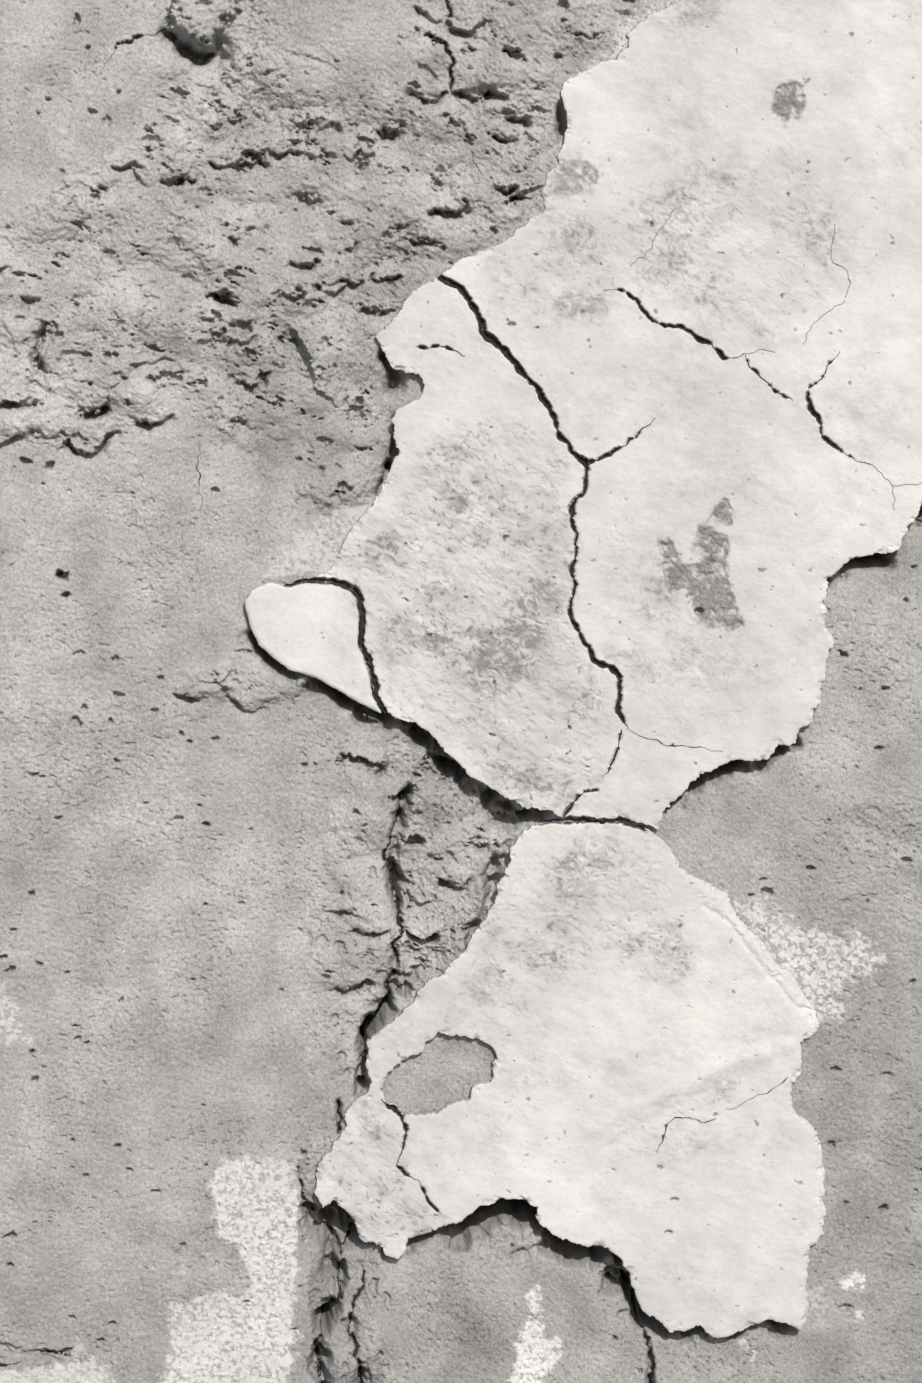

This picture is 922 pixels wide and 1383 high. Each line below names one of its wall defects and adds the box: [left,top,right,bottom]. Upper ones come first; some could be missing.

crack [103,0,172,69]
crack [423,0,483,175]
crack [284,577,386,713]
flaking render [0,0,922,830]
crack [417,276,722,831]
crack [604,210,922,510]
crack [297,1164,318,1214]
crack [313,1222,365,1383]
crack [337,789,441,1214]
flaking render [297,727,826,1383]